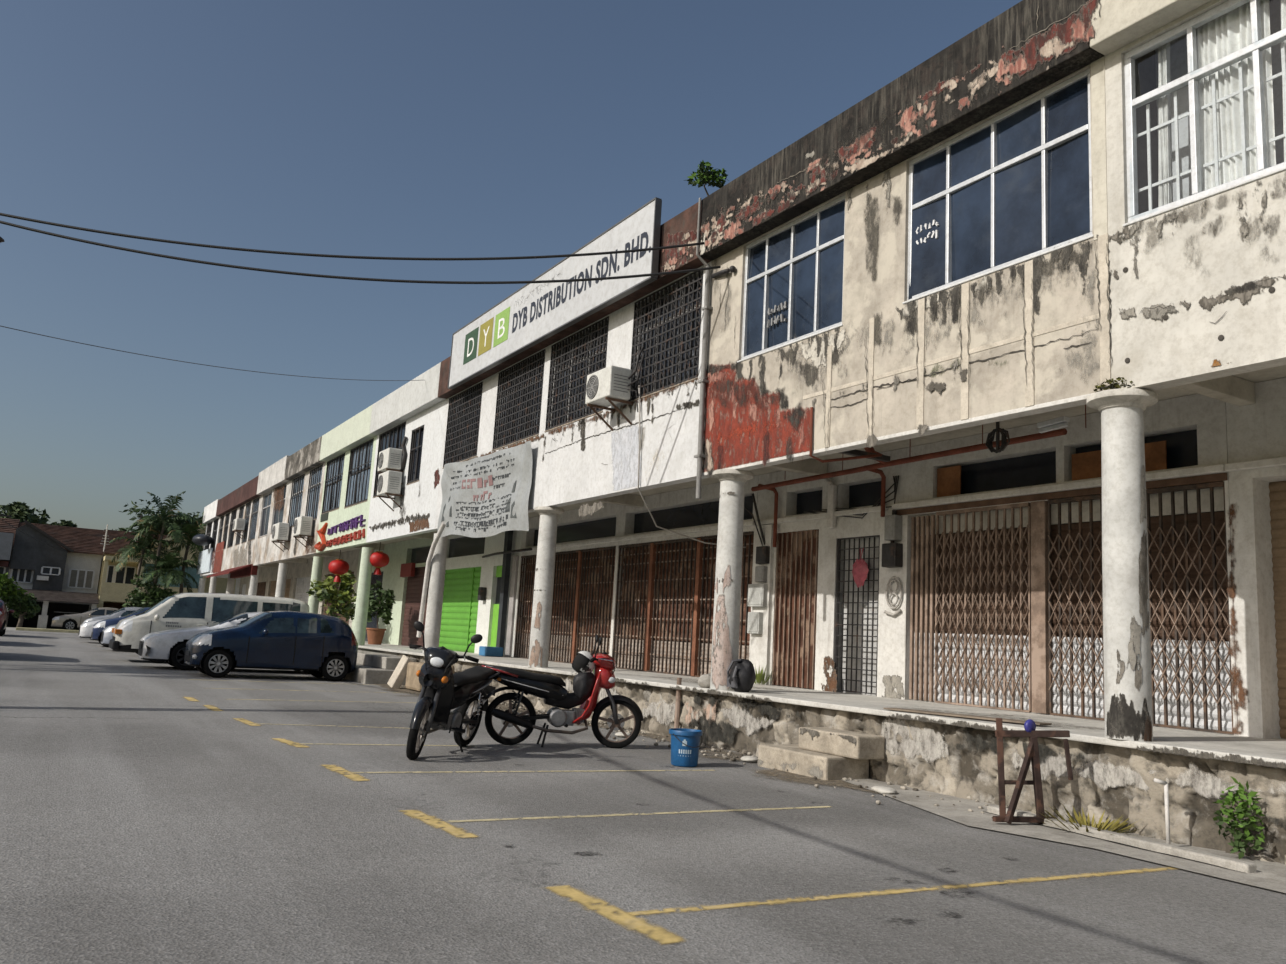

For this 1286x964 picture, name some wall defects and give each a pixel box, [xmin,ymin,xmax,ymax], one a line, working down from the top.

peeling [661,0,1098,272]
damp [847,171,902,281]
damp [1121,172,1286,278]
damp [735,240,1099,412]
peeling [702,362,810,477]
peeling [642,565,774,736]
damp [904,649,1286,769]
peeling [1127,466,1149,670]
corrosion [1227,504,1248,734]
damp [1250,812,1286,830]